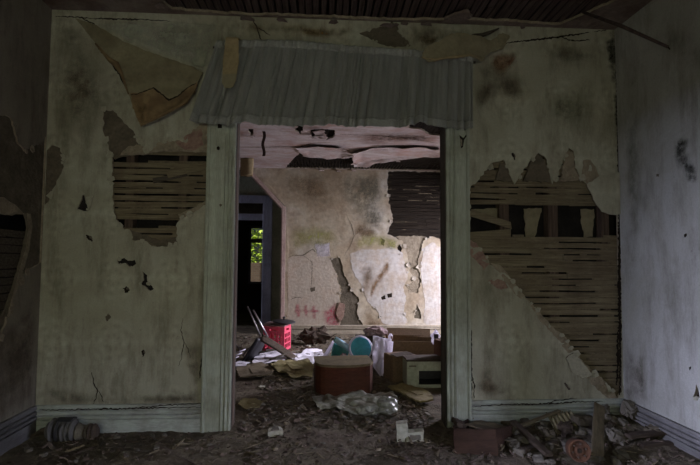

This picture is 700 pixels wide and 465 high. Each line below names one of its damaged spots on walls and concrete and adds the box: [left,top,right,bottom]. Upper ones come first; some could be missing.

flaking render [153,0,611,47]
crack [506,30,606,44]
peeling [240,129,266,177]
flaking render [292,126,334,139]
flaking render [409,122,440,137]
flaking render [101,106,207,249]
flaking render [0,115,66,341]
flaking render [287,153,441,325]
flaking render [470,149,621,399]
crack [179,321,202,378]
crack [39,372,201,411]